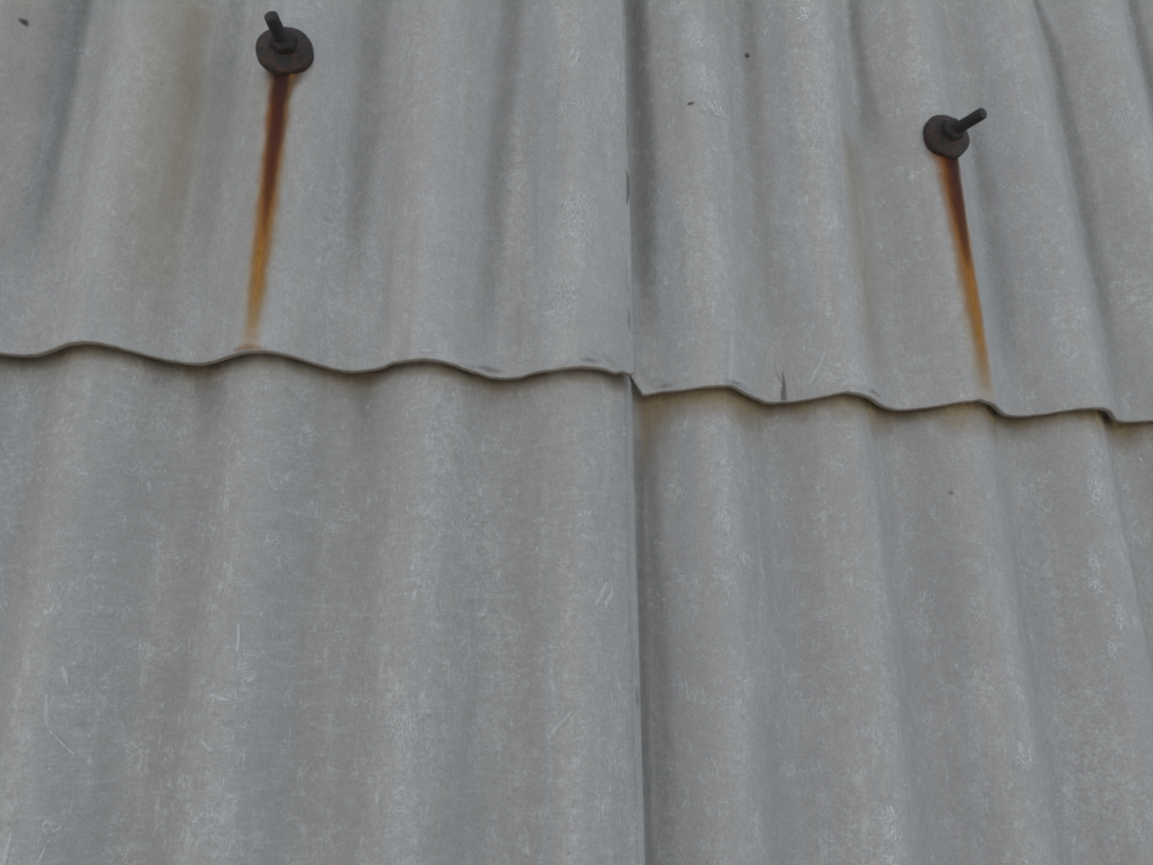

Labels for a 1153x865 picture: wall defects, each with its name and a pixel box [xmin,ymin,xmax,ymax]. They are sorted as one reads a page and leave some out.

rust [252,73,296,303]
rust [938,155,985,355]